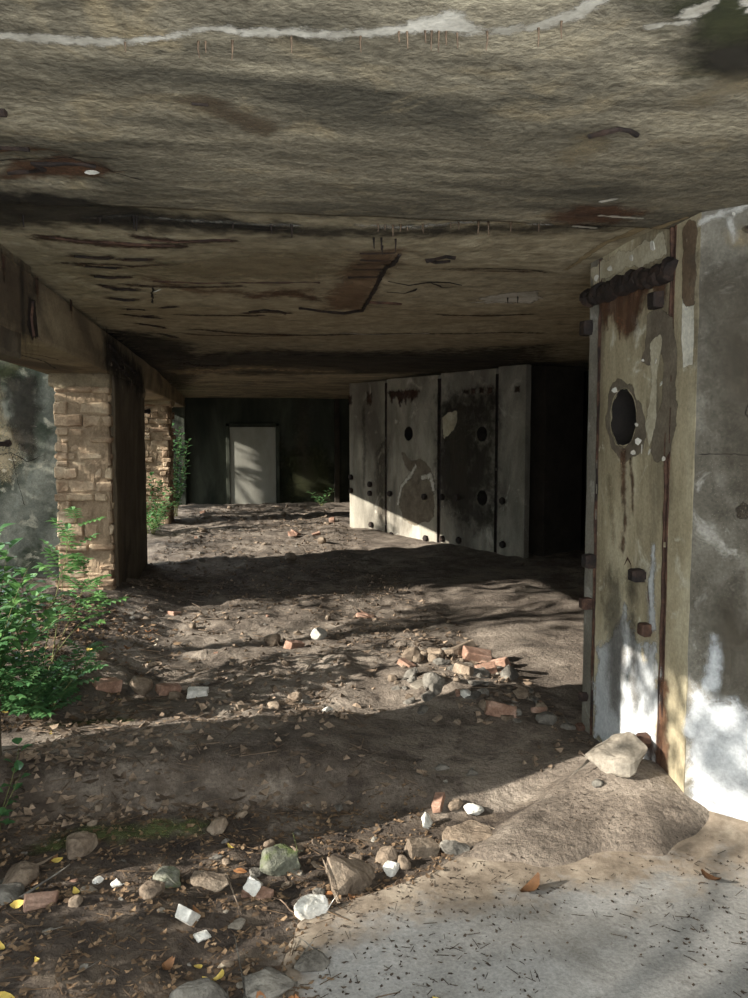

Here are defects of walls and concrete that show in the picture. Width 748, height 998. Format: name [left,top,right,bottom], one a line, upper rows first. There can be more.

leakage [691,41,748,78]
spalling [241,237,402,315]
corrosion [387,390,420,406]
peeling [442,407,457,439]
corrosion [609,449,634,551]